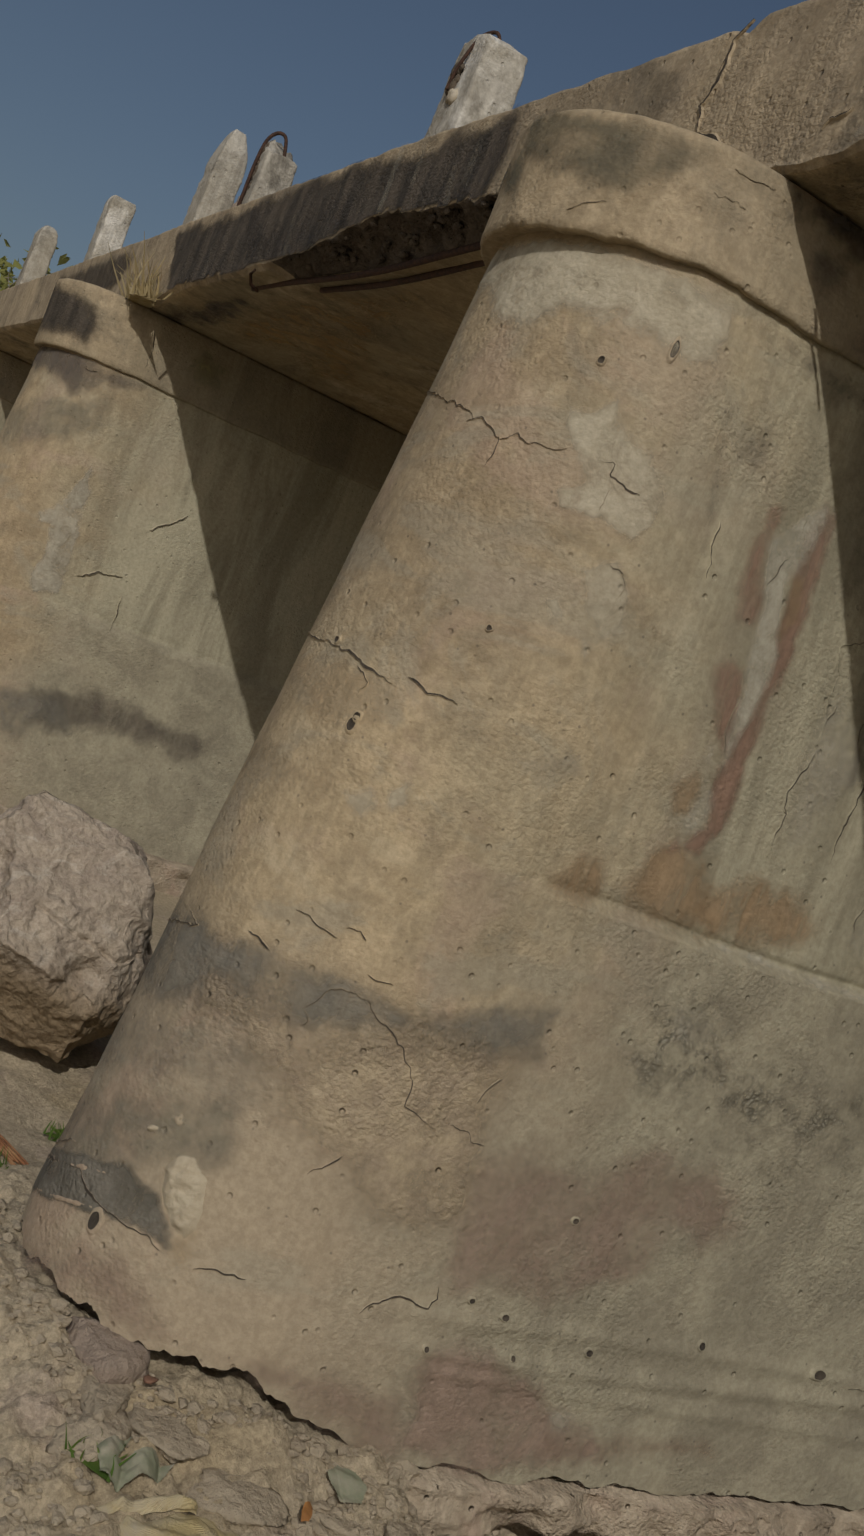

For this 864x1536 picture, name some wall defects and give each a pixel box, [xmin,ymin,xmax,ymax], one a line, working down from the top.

spalling [249,201,493,293]
crack [566,200,606,210]
crack [696,18,776,210]
crack [427,390,567,466]
corrosion [677,520,830,853]
crack [770,642,864,863]
crack [249,931,270,950]
crack [296,909,503,1146]